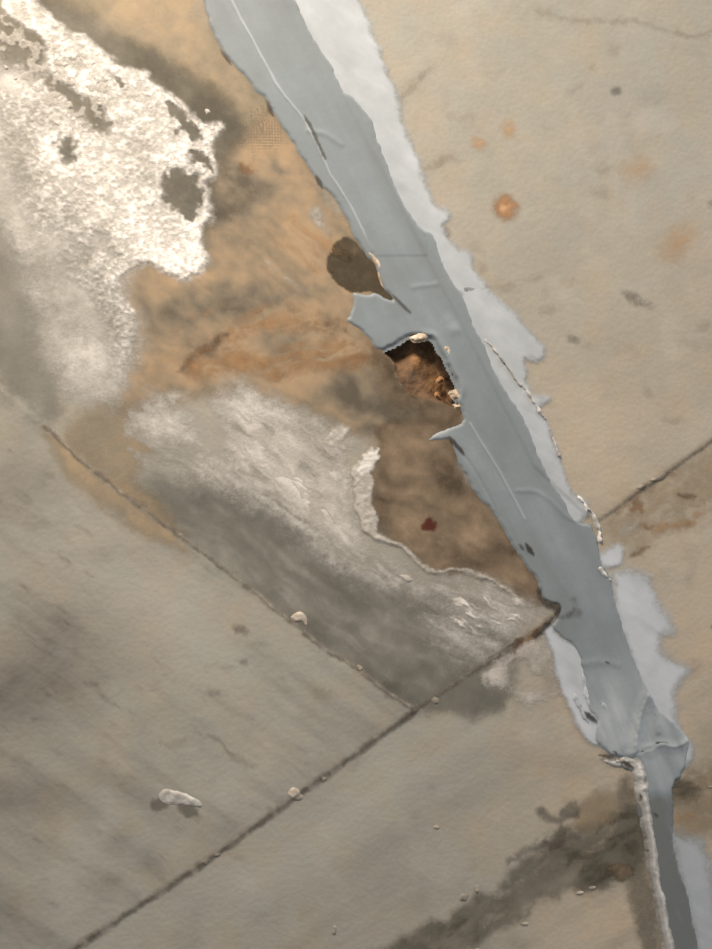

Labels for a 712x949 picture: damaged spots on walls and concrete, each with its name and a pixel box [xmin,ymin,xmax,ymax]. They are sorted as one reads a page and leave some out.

leakage [0,0,244,414]
corrosion [46,0,544,607]
leakage [124,384,560,716]
peeling [327,237,393,300]
spalling [373,333,462,425]
crack [203,0,712,949]
leakage [391,780,656,949]